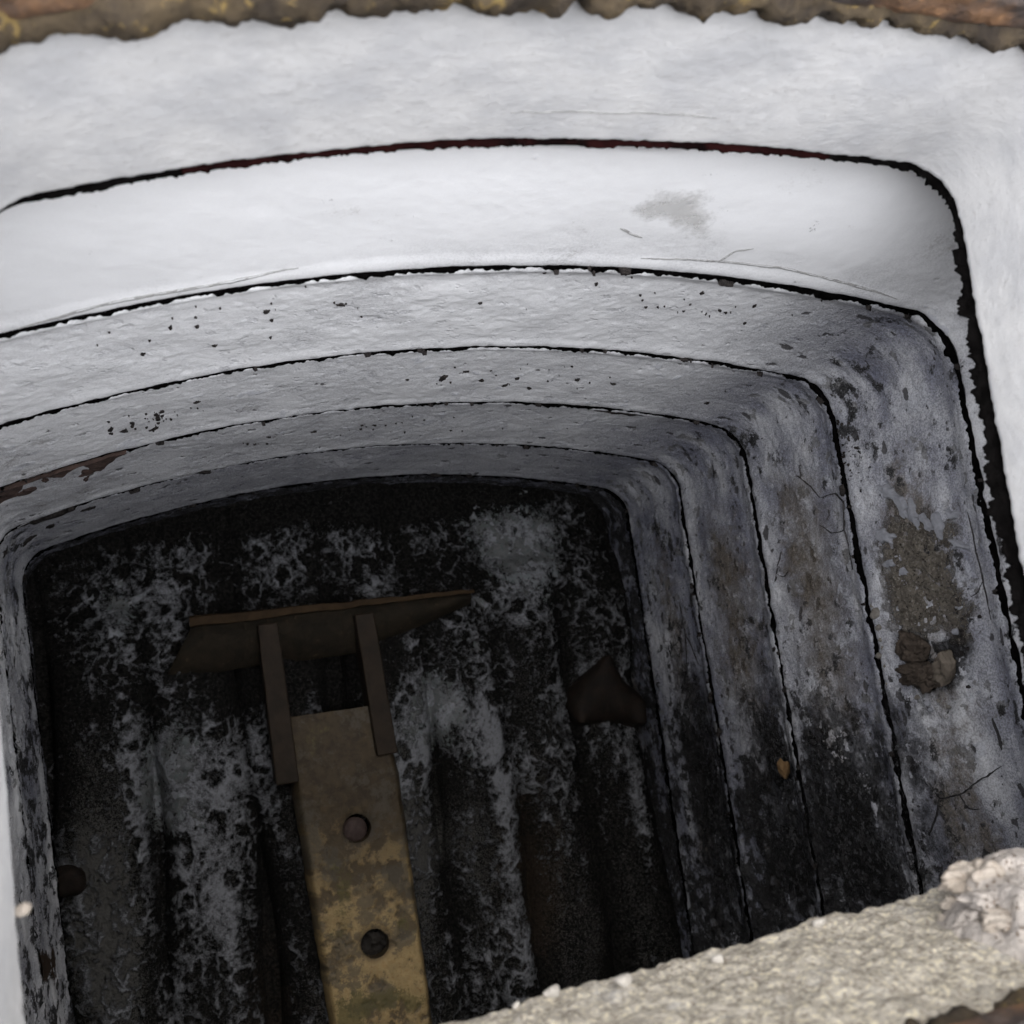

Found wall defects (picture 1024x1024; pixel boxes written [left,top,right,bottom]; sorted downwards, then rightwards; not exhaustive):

hole [107,410,178,435]
crack [0,111,1024,720]
peeling [0,450,128,504]
efflorescence [88,579,145,641]
efflorescence [459,490,563,605]
spalling [870,483,982,658]
efflorescence [396,666,480,764]
crack [0,346,1003,996]
damp [128,717,211,840]
damp [135,846,151,864]
crack [451,1003,522,1022]